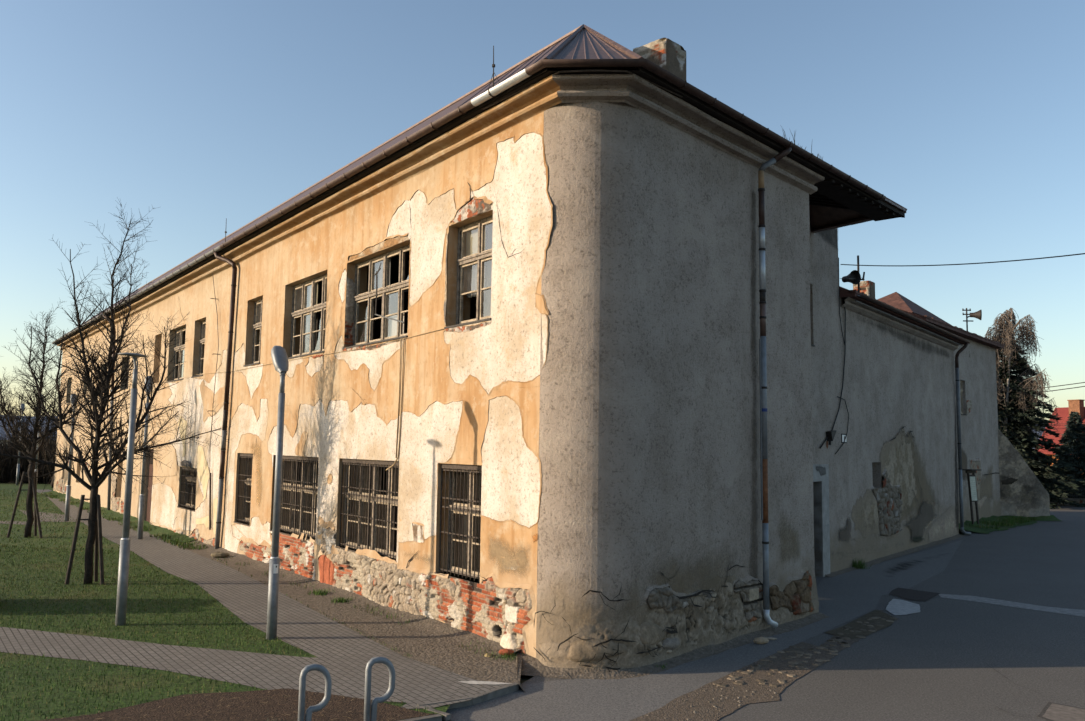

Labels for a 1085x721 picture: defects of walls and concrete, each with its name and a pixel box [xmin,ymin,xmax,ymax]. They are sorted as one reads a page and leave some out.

flaking render [150,131,819,669]
flaking render [852,426,917,541]
crack [534,556,744,672]